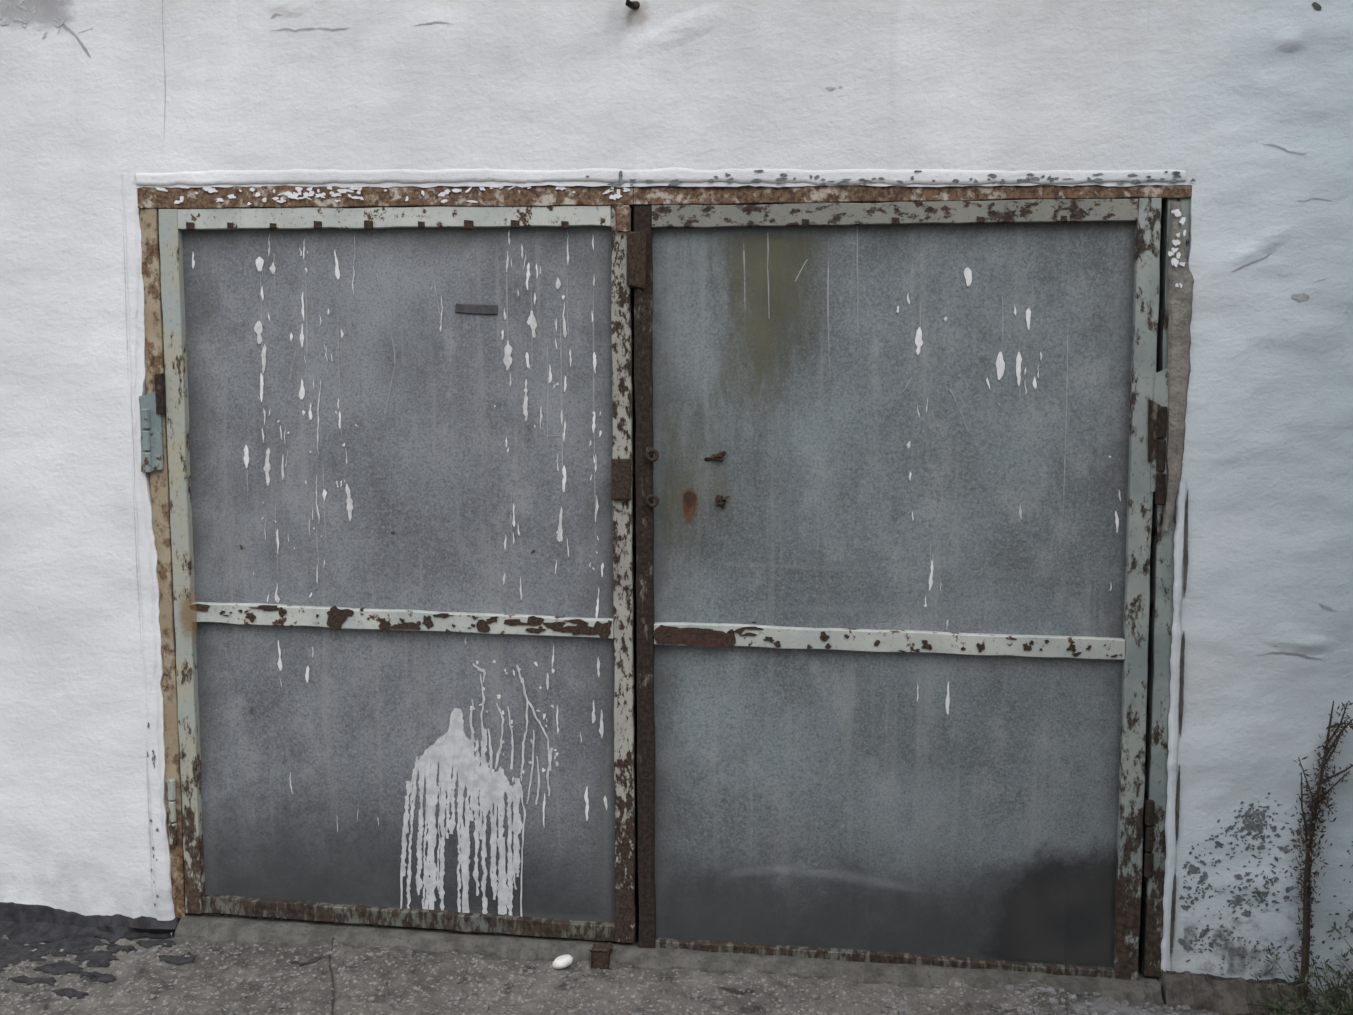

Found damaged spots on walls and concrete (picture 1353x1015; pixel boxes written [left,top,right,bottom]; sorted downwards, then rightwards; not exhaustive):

peeling [405,186,531,203]
peeling [603,171,683,200]
peeling [752,170,935,186]
peeling [953,173,1071,184]
peeling [1087,171,1196,184]
corrosion [189,604,364,630]
corrosion [379,613,612,639]
corrosion [653,621,781,648]
corrosion [807,631,850,649]
corrosion [898,640,932,653]
corrosion [1066,644,1118,658]
leakage [1213,931,1274,976]